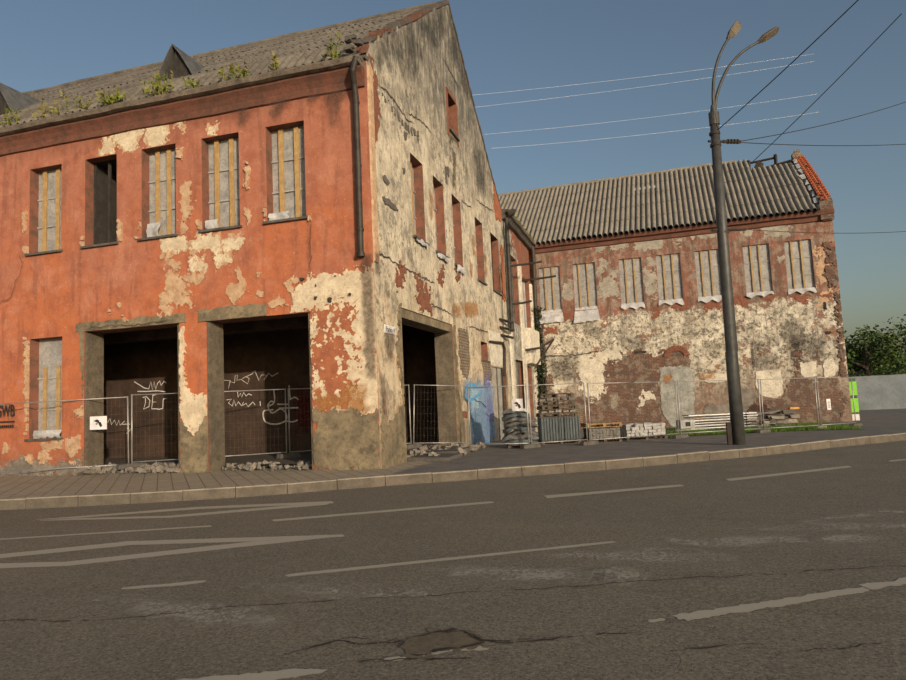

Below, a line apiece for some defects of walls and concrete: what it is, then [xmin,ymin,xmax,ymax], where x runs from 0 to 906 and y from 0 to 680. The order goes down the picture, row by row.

peeling [98,121,187,160]
peeling [205,120,220,136]
crack [381,87,430,131]
peeling [243,161,251,190]
peeling [116,219,141,242]
peeling [590,233,717,319]
peeling [157,175,461,473]
spalling [542,279,575,336]
spalling [702,300,722,314]
spalling [734,293,749,308]
spalling [741,240,849,424]
spalling [543,345,691,430]